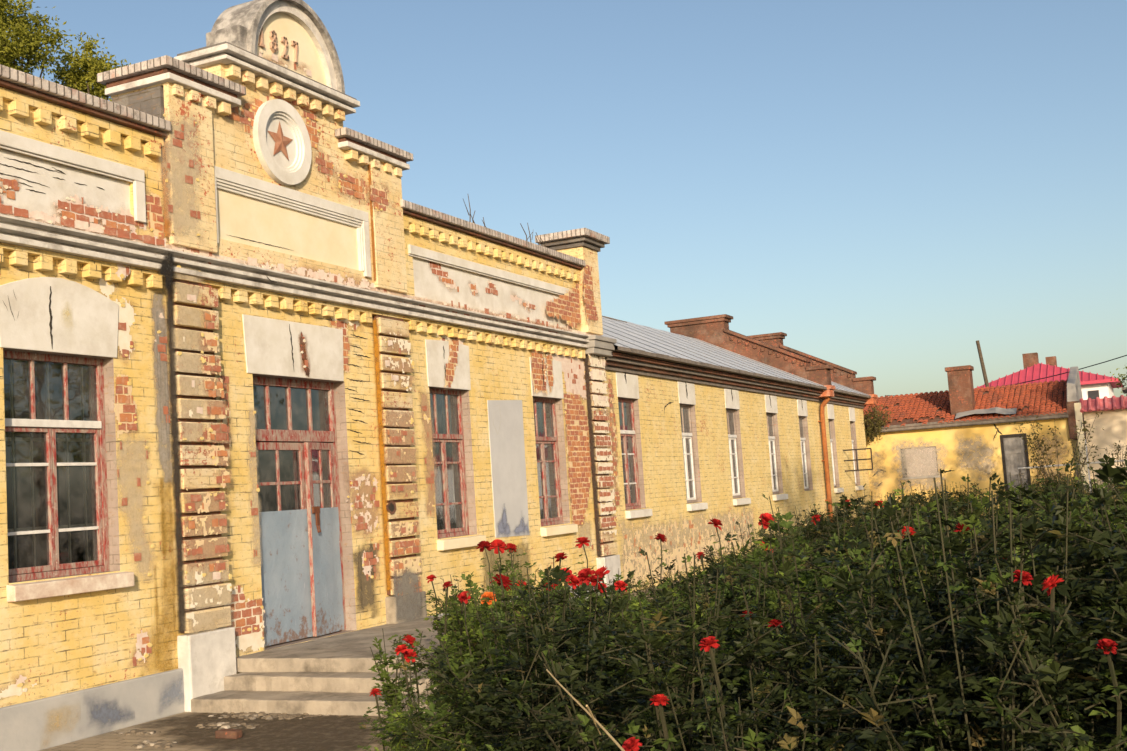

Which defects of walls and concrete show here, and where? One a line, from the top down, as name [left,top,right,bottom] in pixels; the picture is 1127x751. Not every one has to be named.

spalling [226,90,389,213]
crack [47,286,55,349]
peeling [0,114,265,652]
spalling [346,332,436,595]
spalling [244,257,599,336]
spalling [531,347,753,585]